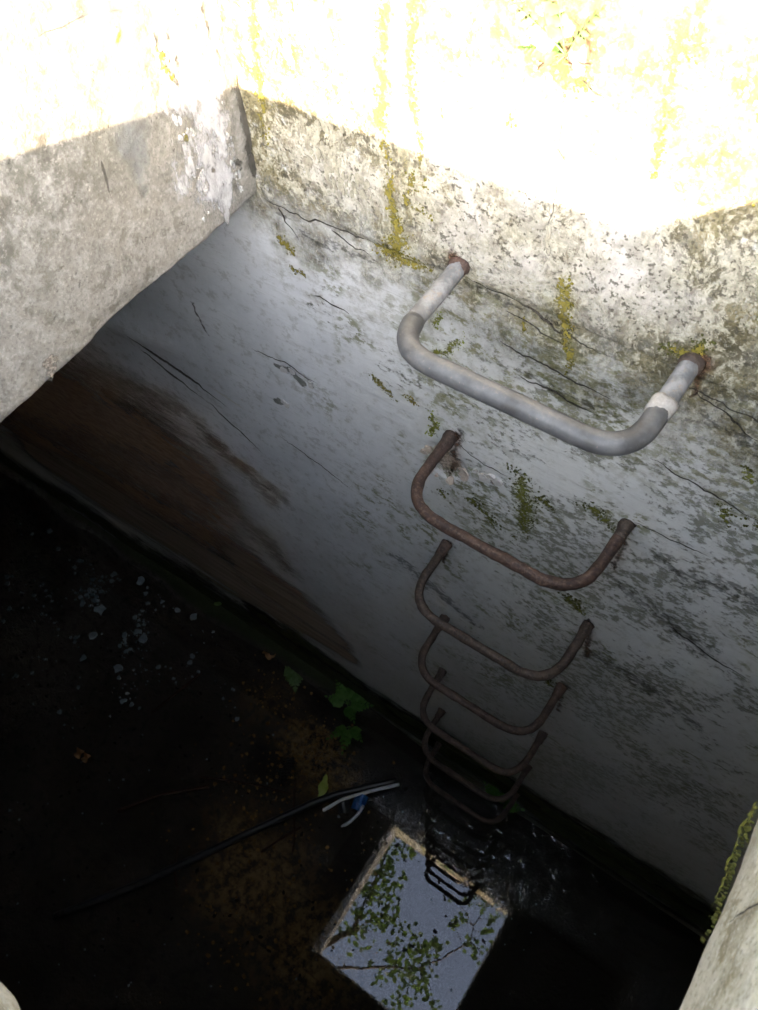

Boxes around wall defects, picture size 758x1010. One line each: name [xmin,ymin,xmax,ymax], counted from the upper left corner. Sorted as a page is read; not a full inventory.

water stain [169,0,256,223]
crack [127,336,259,450]
corrosion [689,354,714,397]
corrosion [439,430,462,476]
corrosion [435,539,453,564]
corrosion [611,518,636,569]
corrosion [578,619,595,658]